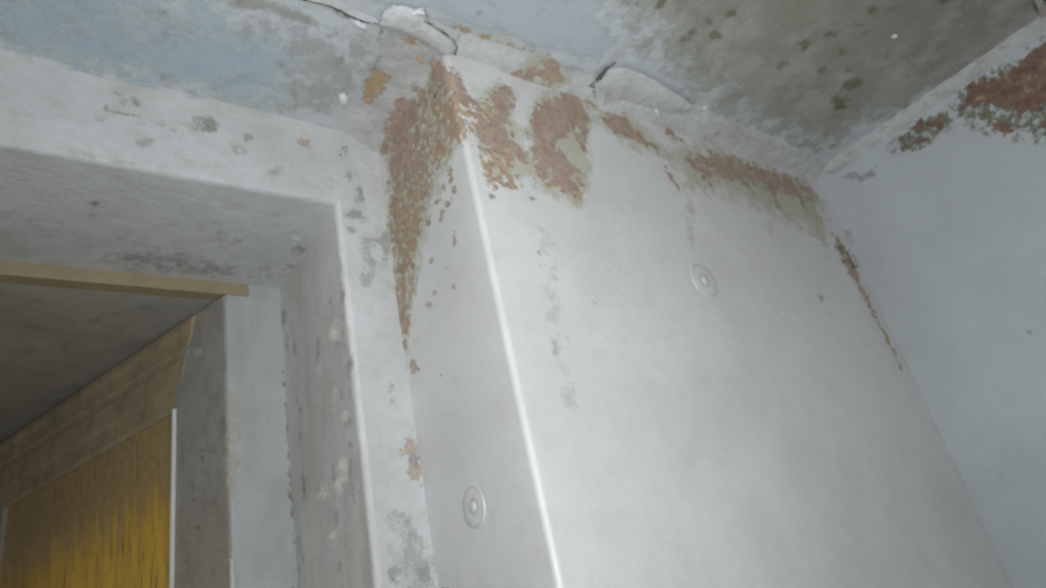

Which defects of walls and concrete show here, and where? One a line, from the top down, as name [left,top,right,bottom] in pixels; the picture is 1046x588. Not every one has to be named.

crack [303,0,383,69]
crack [562,62,616,96]
damp [636,0,1046,145]